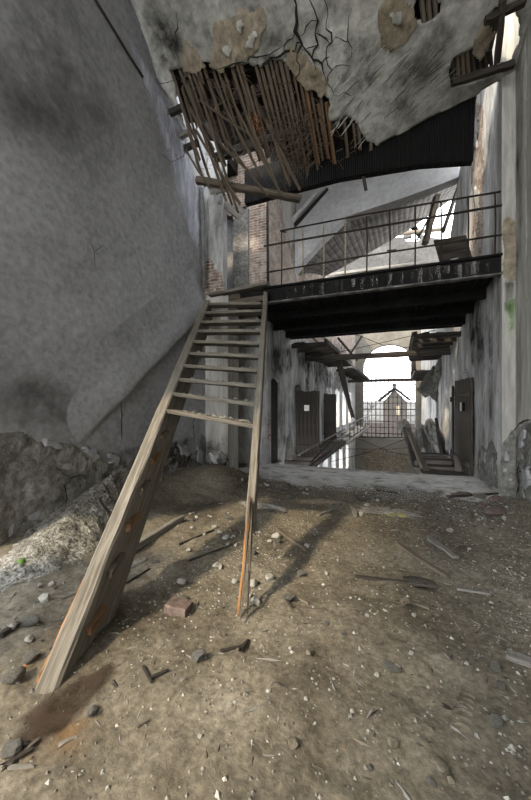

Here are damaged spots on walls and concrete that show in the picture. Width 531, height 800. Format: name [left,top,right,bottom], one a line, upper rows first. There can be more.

flaking render [180,7,266,76]
crack [206,0,352,96]
flaking render [285,46,329,98]
flaking render [377,0,417,52]
flaking render [473,25,497,61]
damp [469,300,492,364]
damp [273,348,346,394]
spalling [0,432,136,545]
spalling [159,443,230,483]
spalling [477,422,531,502]